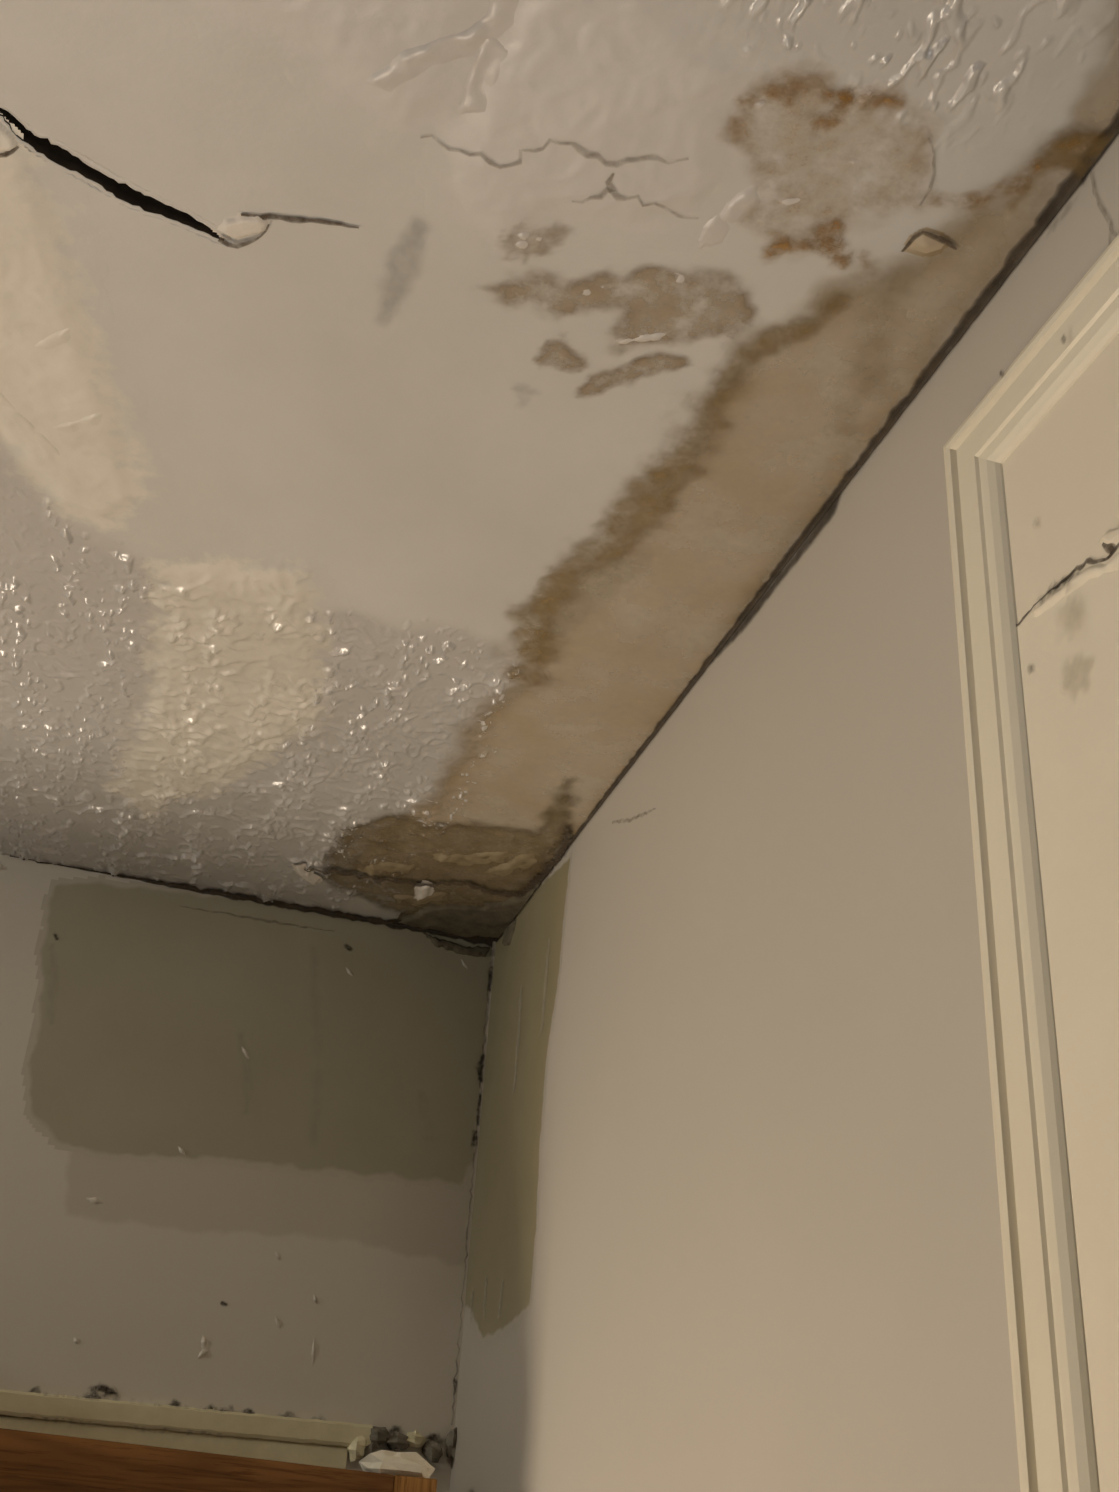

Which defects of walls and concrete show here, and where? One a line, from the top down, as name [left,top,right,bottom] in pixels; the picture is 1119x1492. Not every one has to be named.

crack [0,104,1119,991]
water stain [291,212,1028,938]
crack [472,1055,485,1145]